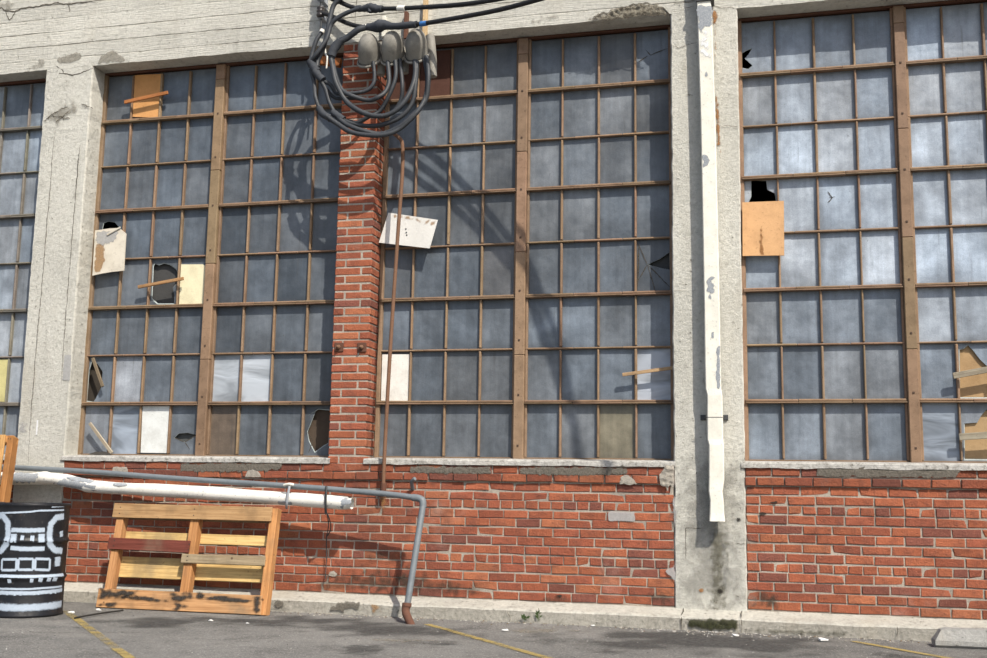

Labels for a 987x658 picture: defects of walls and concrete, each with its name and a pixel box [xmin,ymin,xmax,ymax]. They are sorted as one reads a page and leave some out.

crack [0,1,95,21]
spalling [589,2,666,21]
peeling [57,53,81,63]